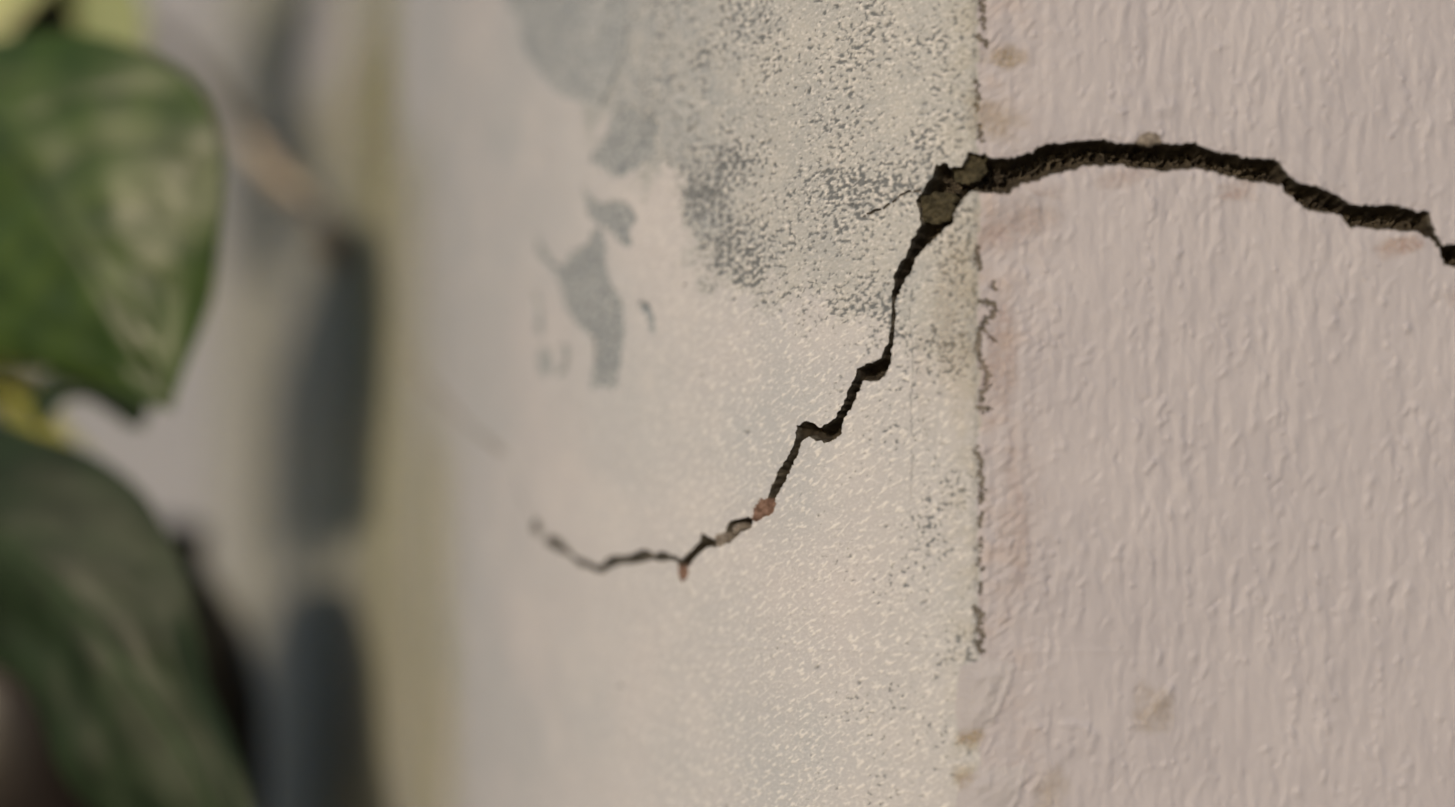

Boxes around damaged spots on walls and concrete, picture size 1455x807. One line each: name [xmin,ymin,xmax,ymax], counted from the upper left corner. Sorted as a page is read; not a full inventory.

peeling [507,0,659,178]
peeling [536,185,656,390]
crack [399,0,1455,656]